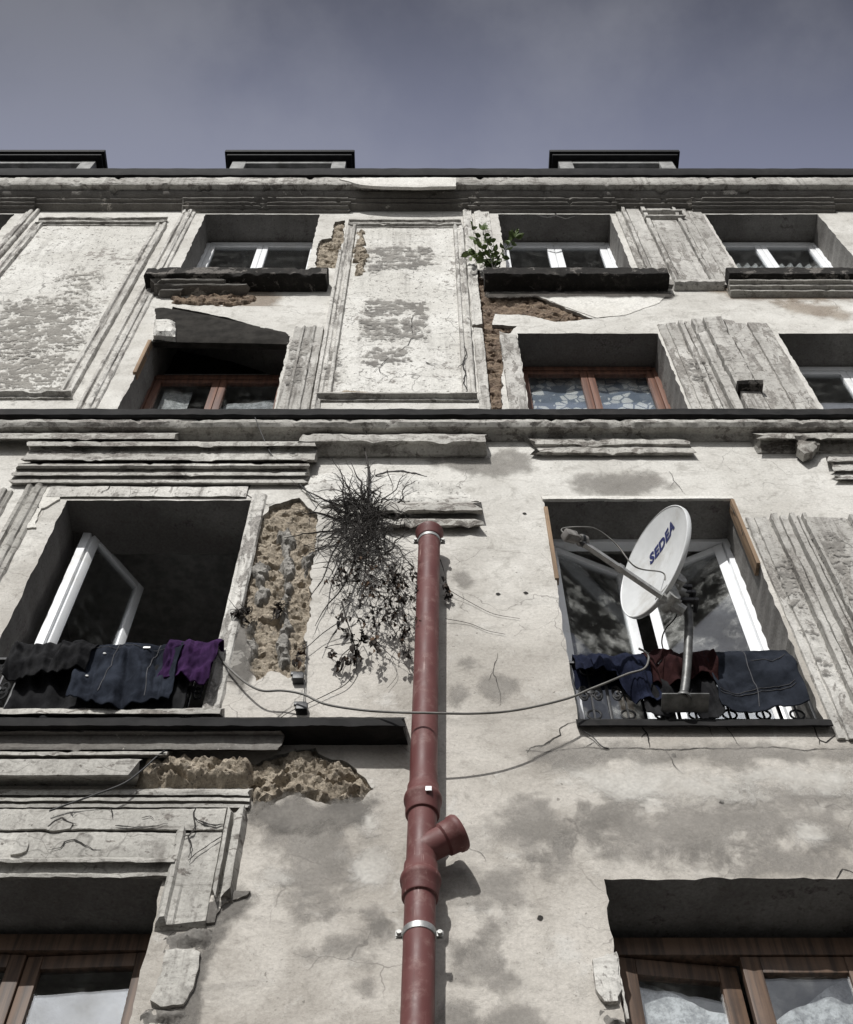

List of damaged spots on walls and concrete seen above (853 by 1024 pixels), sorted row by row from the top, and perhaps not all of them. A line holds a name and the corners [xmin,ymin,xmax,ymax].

peeling [316,223,435,276]
flaking render [170,293,257,307]
crack [379,317,468,396]
flaking render [474,273,583,409]
water stain [430,450,529,475]
water stain [572,473,663,494]
flaking render [227,502,318,682]
flaking render [131,751,371,815]
crack [48,812,101,850]
crack [109,807,222,860]
water stain [249,792,377,913]
water stain [579,782,853,877]